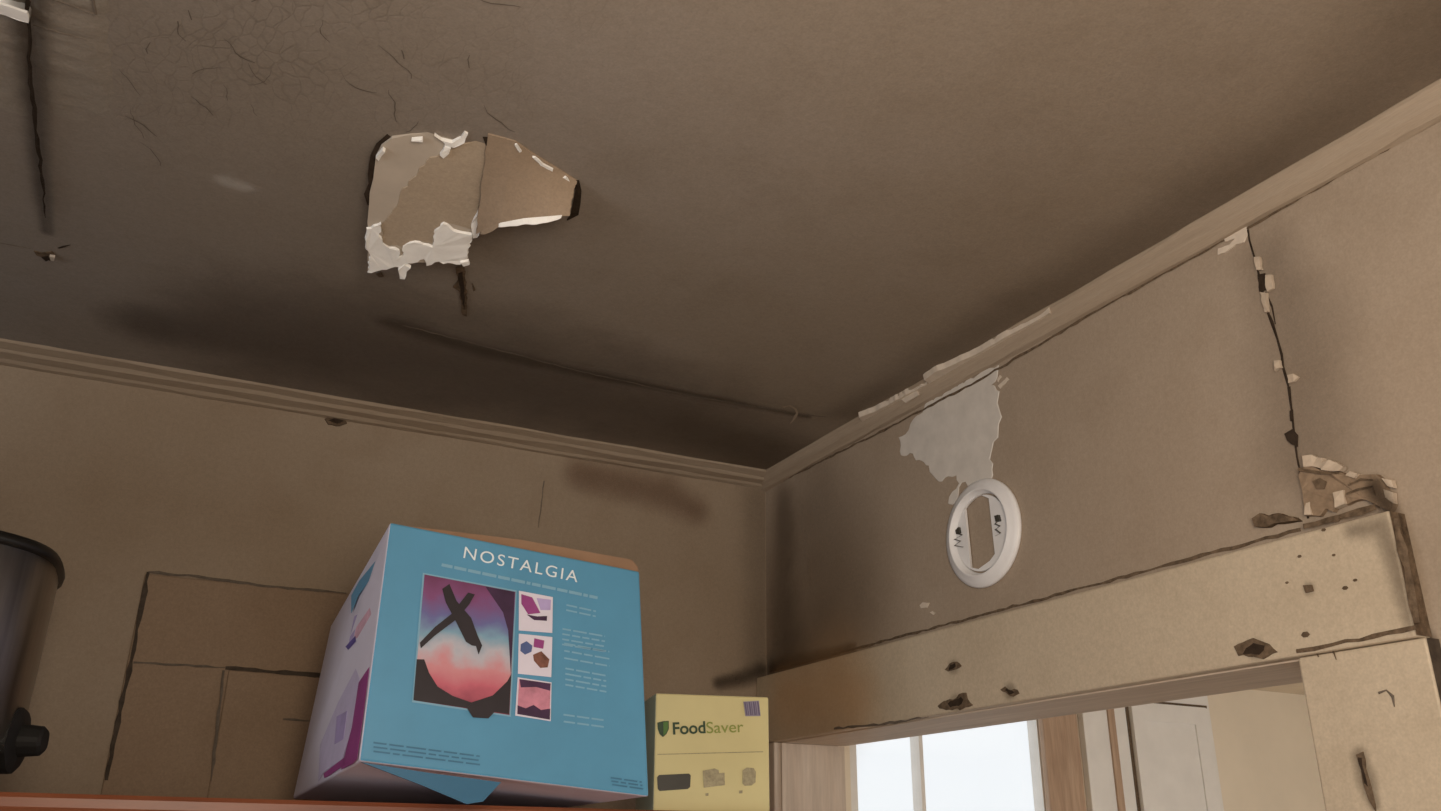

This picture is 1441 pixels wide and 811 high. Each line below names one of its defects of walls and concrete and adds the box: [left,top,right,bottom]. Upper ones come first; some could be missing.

peeling [0,0,29,23]
crack [20,0,97,218]
crack [343,47,418,132]
peeling [411,131,468,159]
peeling [515,143,570,182]
peeling [471,210,480,238]
peeling [398,264,411,279]
peeling [784,162,1365,505]
crack [1247,229,1300,468]
flaking render [1252,455,1398,532]
peeling [1234,638,1277,659]
peeling [938,693,973,710]